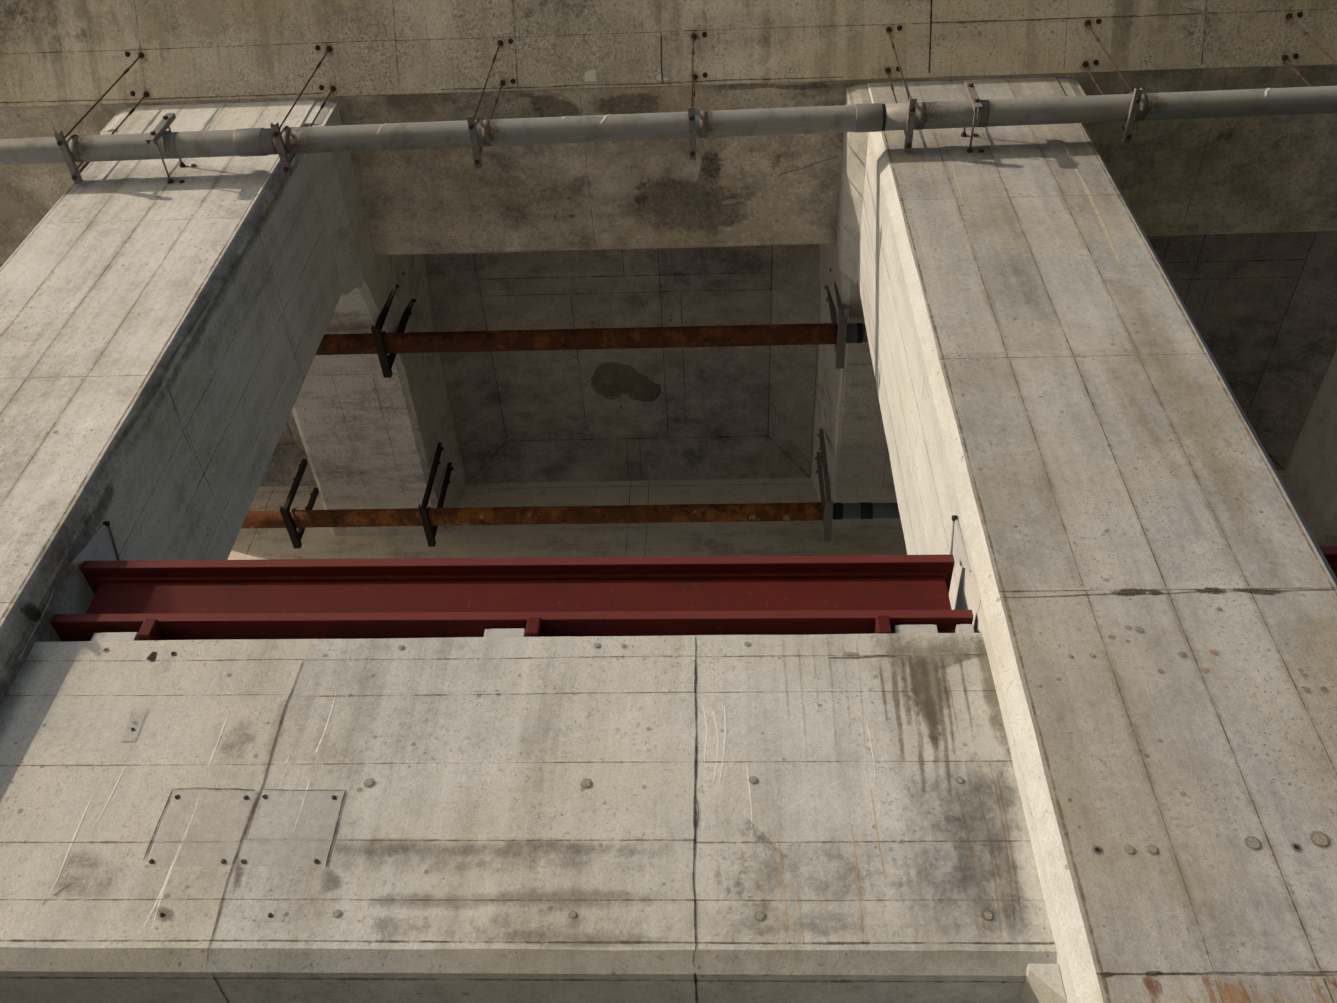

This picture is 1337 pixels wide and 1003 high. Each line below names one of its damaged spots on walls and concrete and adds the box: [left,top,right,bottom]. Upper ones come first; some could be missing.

crack [208,661,303,1003]
crack [691,637,699,1003]
damp [702,704,726,787]
damp [825,645,987,766]
damp [946,763,1021,932]
damp [986,680,999,725]